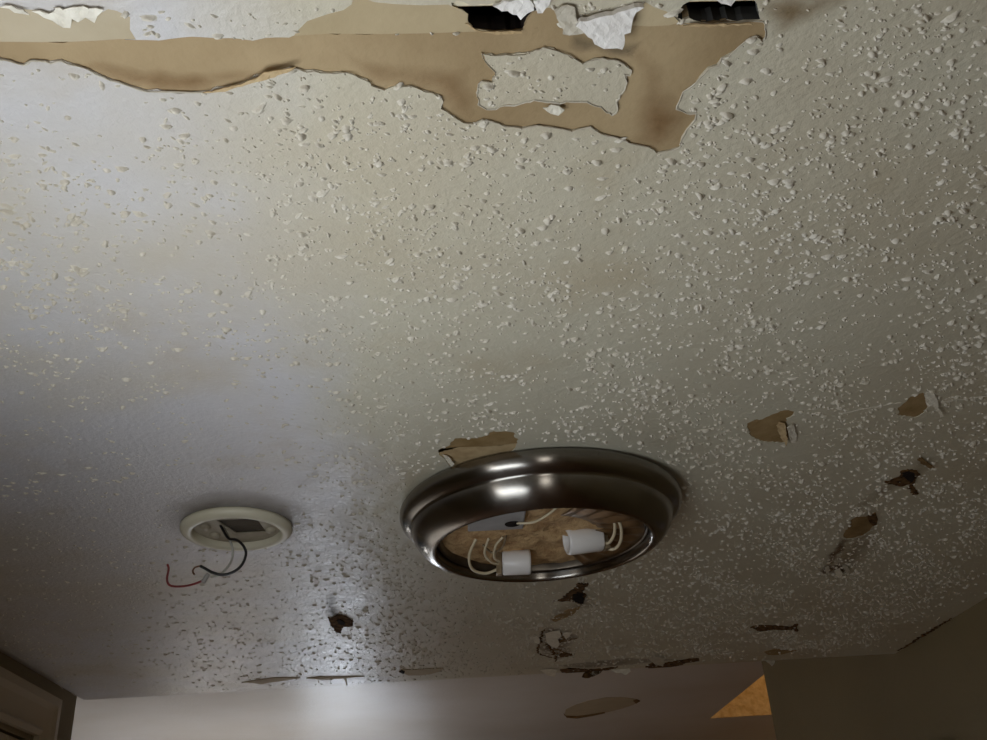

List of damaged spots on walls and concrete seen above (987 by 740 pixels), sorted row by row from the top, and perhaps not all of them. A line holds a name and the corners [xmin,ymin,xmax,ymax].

peeling [0,0,767,154]
peeling [898,391,944,417]
peeling [747,410,797,446]
peeling [438,431,518,466]
peeling [823,512,878,579]
spalling [328,615,354,633]
crack [533,630,699,678]
peeling [564,697,640,719]